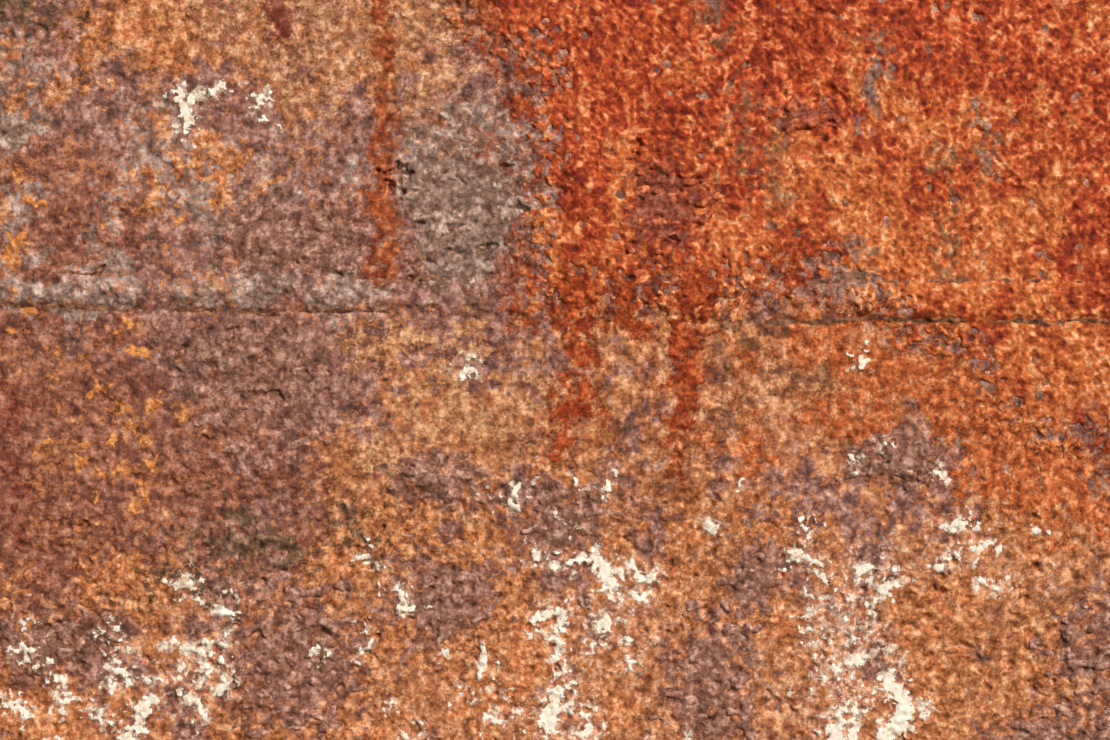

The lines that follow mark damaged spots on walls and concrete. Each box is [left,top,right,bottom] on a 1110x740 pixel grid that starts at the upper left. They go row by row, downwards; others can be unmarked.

crack [780,274,1041,284]
crack [10,266,525,323]
crack [763,311,1110,327]